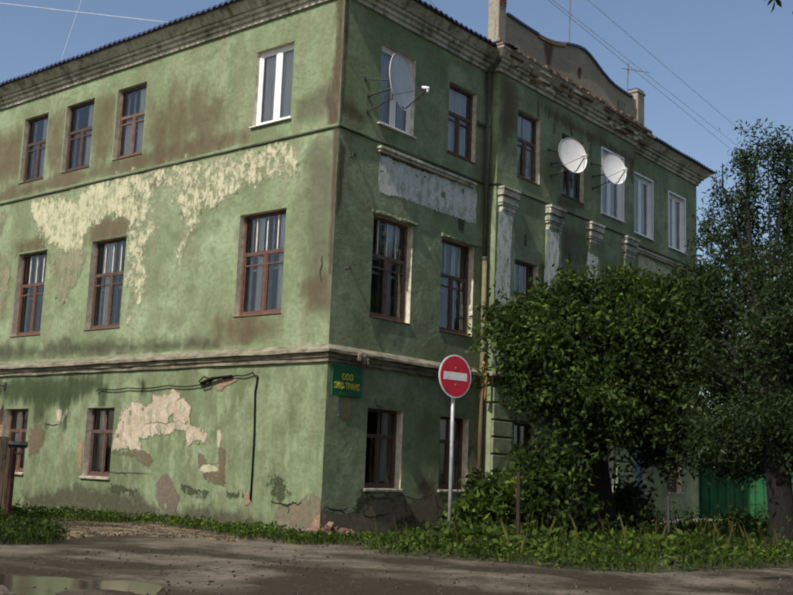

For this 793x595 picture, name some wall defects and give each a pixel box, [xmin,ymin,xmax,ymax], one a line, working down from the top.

spalling [494,38,656,147]
peeling [378,154,477,224]
peeling [30,142,300,324]
peeling [495,211,513,311]
peeling [544,229,560,300]
peeling [587,253,598,280]
leakage [98,386,107,406]
peeling [111,388,226,487]
crack [324,493,442,529]